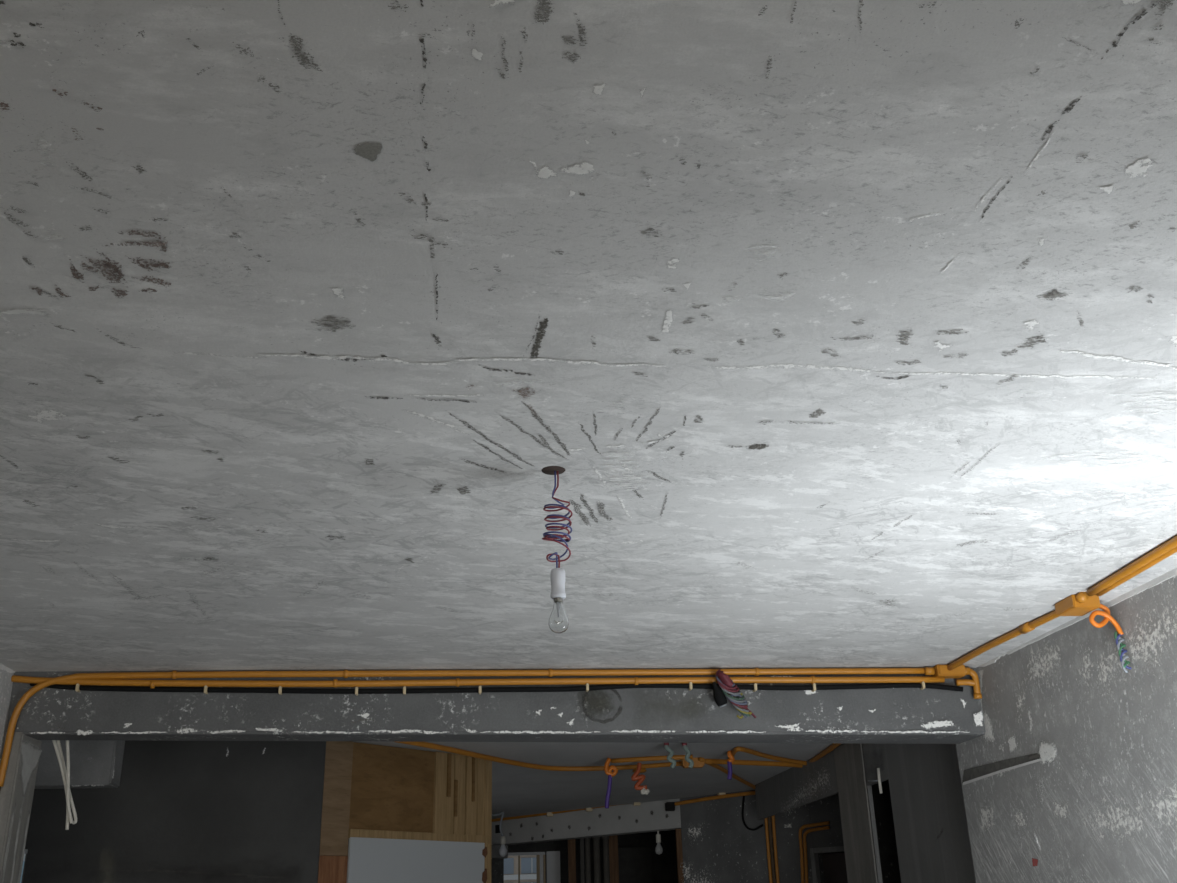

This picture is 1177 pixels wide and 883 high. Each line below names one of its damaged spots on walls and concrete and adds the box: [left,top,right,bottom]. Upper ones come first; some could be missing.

crack [1102,3,1155,59]
crack [975,96,1082,218]